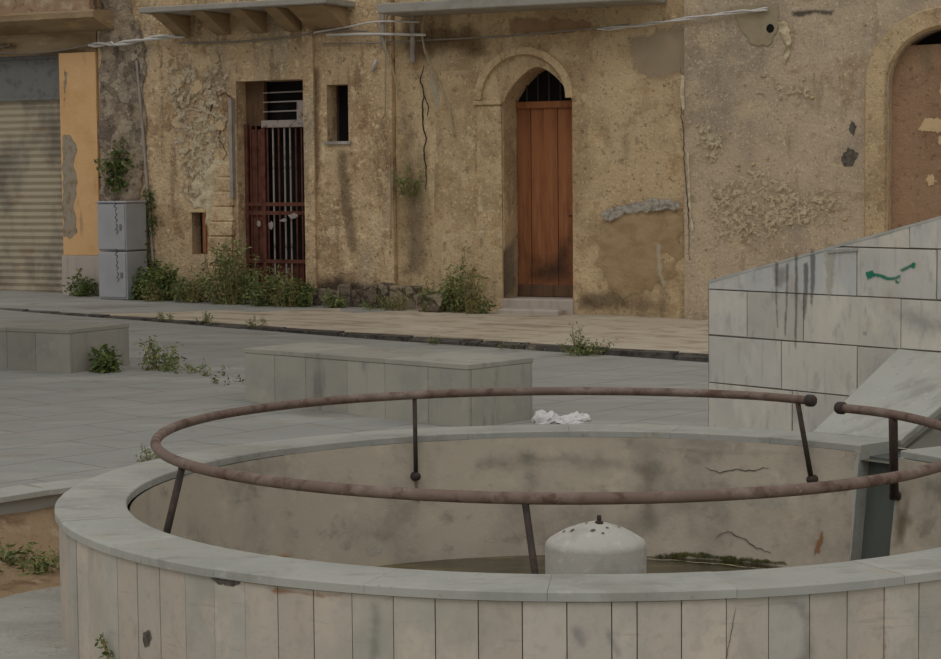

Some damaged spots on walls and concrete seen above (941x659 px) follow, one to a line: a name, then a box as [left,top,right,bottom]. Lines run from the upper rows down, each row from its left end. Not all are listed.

crack [420,65,429,191]
flaking render [918,118,941,144]
peeling [62,135,77,239]
crack [704,466,770,474]
crack [717,531,770,553]